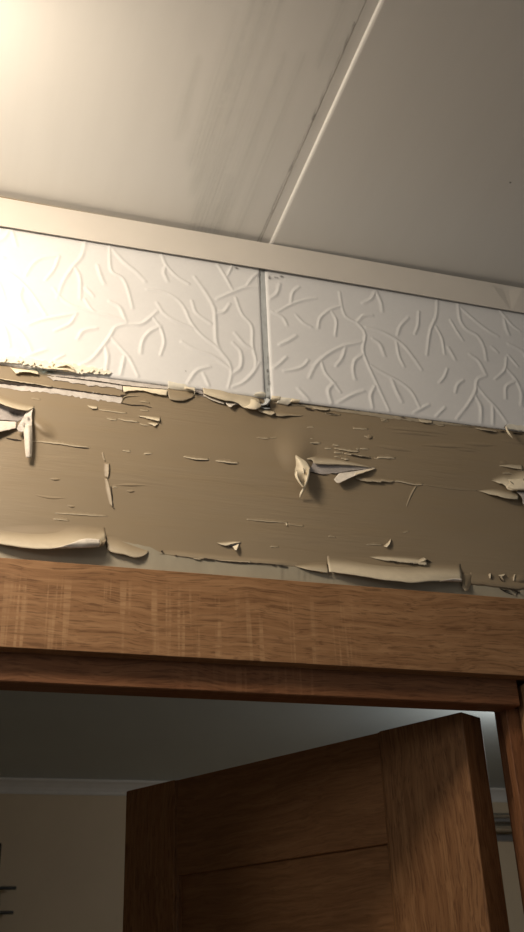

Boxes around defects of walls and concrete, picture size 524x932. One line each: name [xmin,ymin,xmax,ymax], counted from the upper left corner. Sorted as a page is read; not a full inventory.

peeling [0,357,524,497]
peeling [479,464,524,504]
peeling [0,524,148,558]
peeling [161,539,524,593]